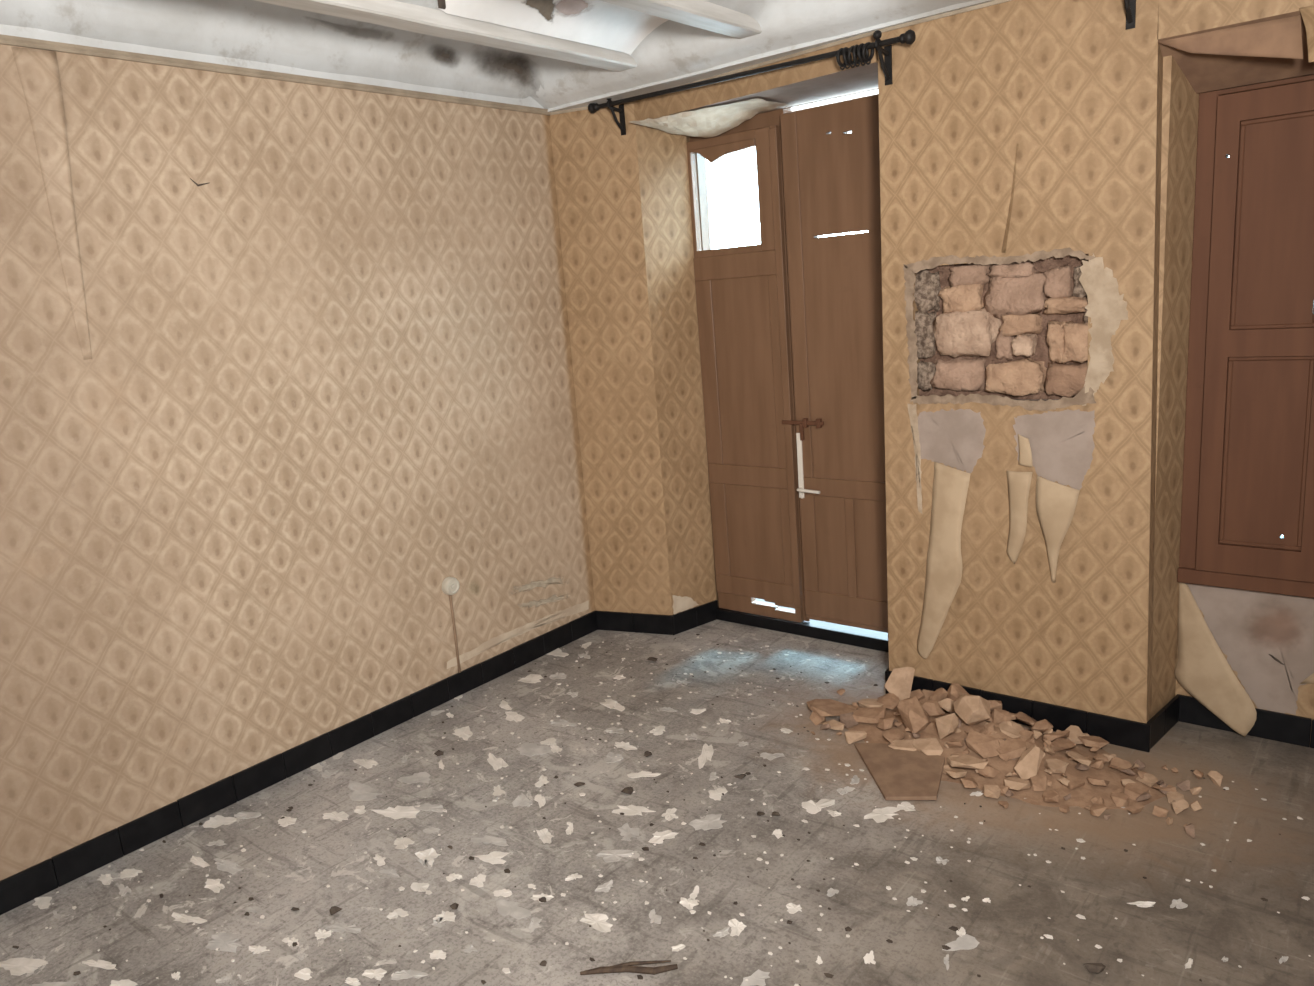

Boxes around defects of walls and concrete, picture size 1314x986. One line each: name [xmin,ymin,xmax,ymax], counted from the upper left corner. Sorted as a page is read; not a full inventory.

water stain [433,49,455,63]
water stain [483,55,533,85]
flaking render [903,247,1128,490]
flaking render [1185,583,1314,715]